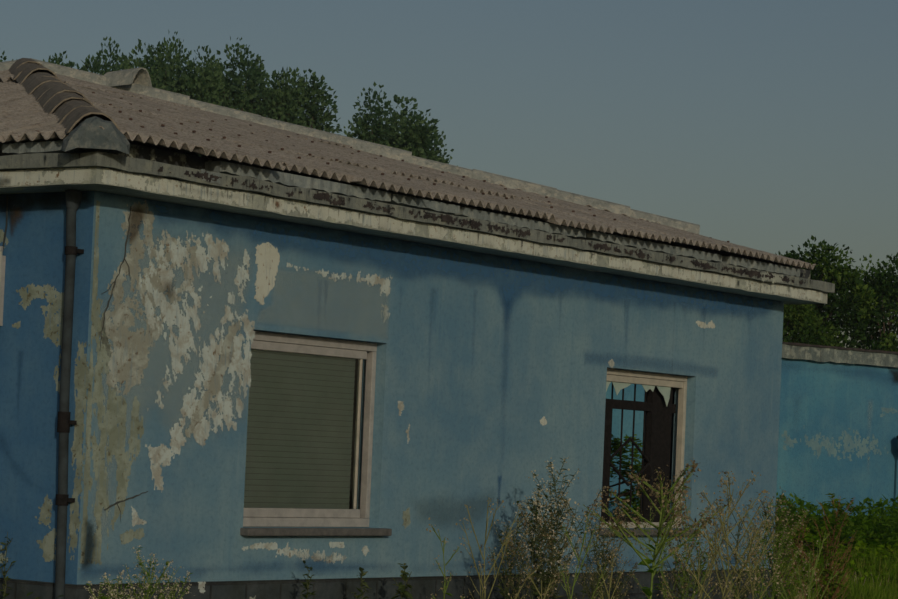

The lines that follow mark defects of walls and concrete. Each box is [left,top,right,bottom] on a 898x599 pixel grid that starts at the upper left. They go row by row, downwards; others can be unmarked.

spalling [0,140,62,156]
peeling [0,167,91,187]
crack [100,206,131,348]
peeling [16,284,64,394]
peeling [67,144,823,565]
peeling [35,495,57,565]
crack [104,491,148,520]